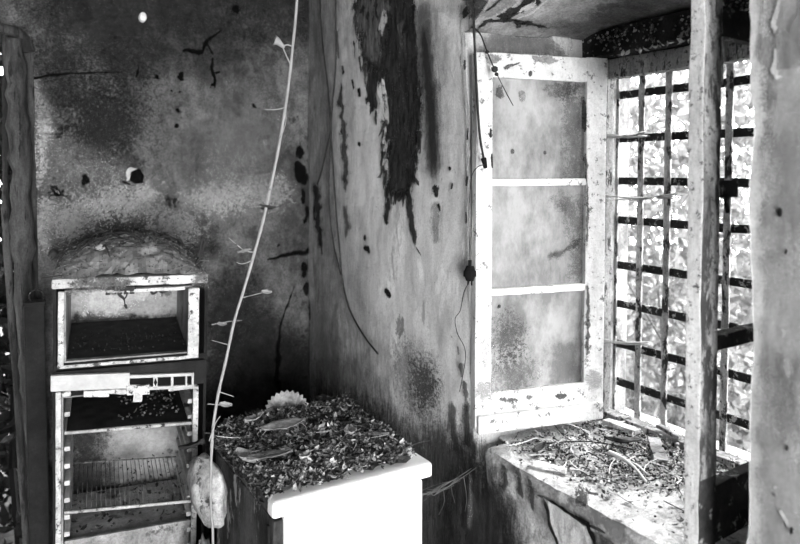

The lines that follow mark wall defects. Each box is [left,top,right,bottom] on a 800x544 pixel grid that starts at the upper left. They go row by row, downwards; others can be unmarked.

crack [34,71,116,79]
flaking render [122,167,144,186]
water stain [33,54,323,257]
flaking render [459,0,547,266]
water stain [301,262,311,323]
crack [274,286,295,391]
water stain [408,353,441,413]
flaking render [457,346,470,414]